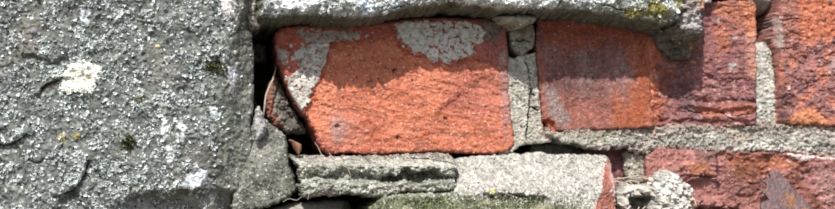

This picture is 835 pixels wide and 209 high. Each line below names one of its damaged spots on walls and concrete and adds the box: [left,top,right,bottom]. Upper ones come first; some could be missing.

crack [491,39,552,155]